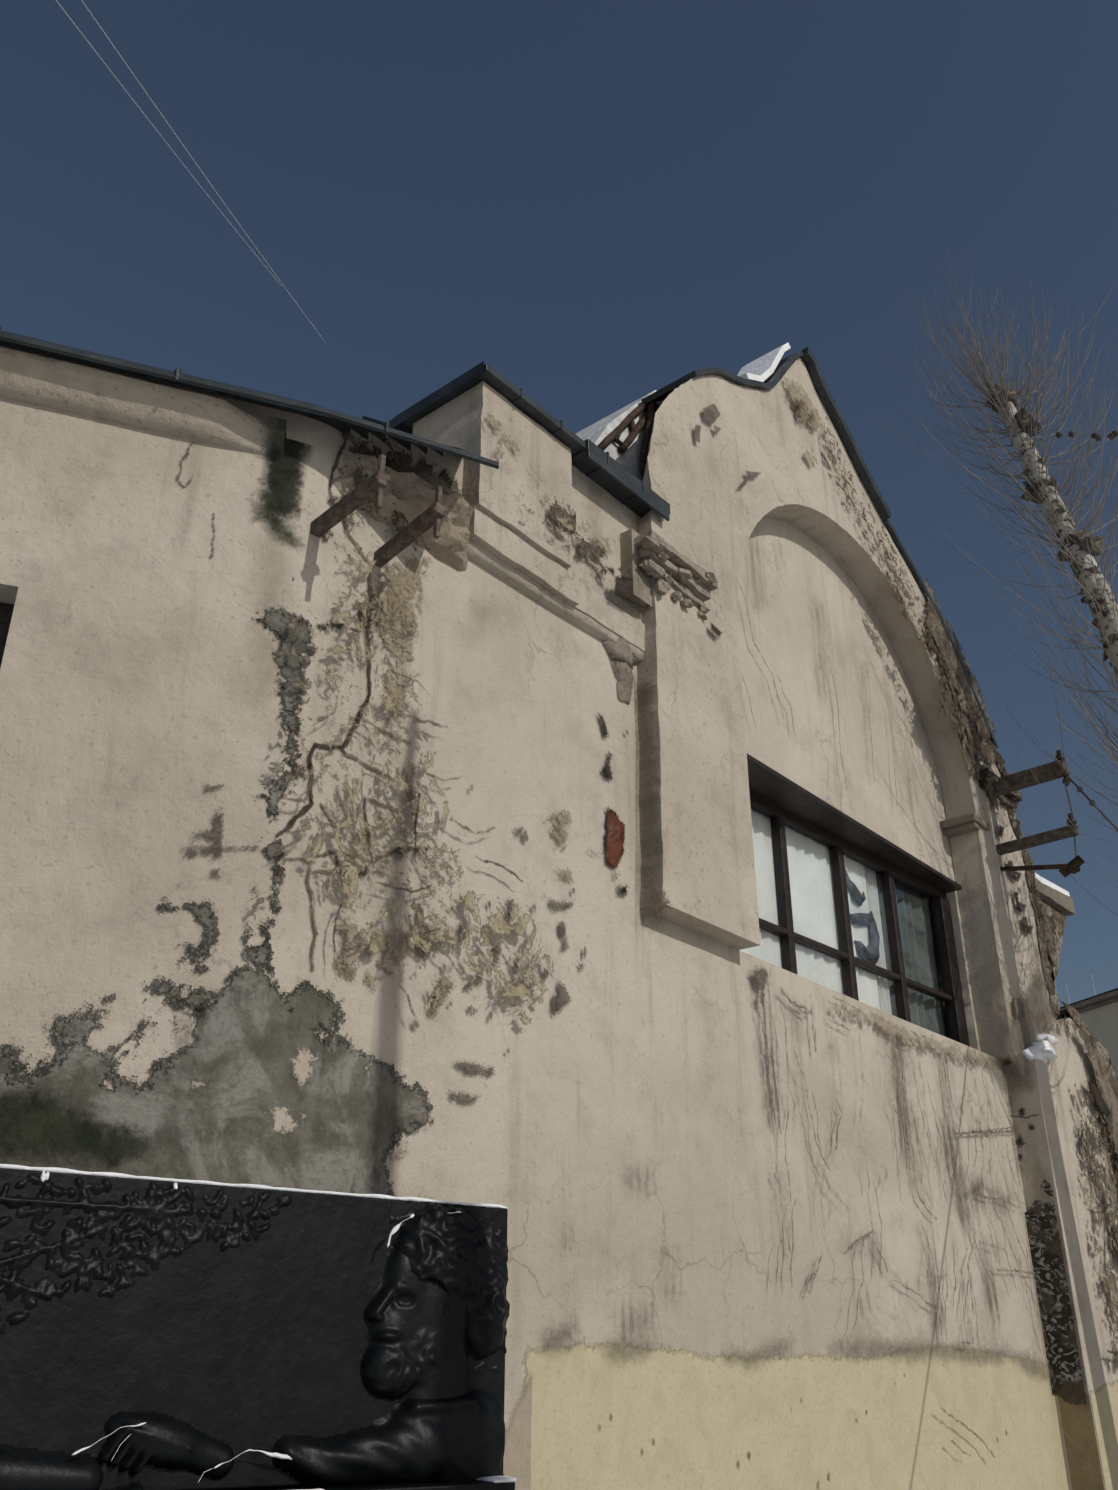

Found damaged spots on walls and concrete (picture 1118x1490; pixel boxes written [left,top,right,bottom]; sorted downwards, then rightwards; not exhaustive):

leakage [266,416,310,516]
spalling [0,427,586,1197]
crack [273,438,525,1016]
spalling [783,377,1118,1367]
crack [756,987,1049,1345]
spalling [1024,1179,1087,1405]